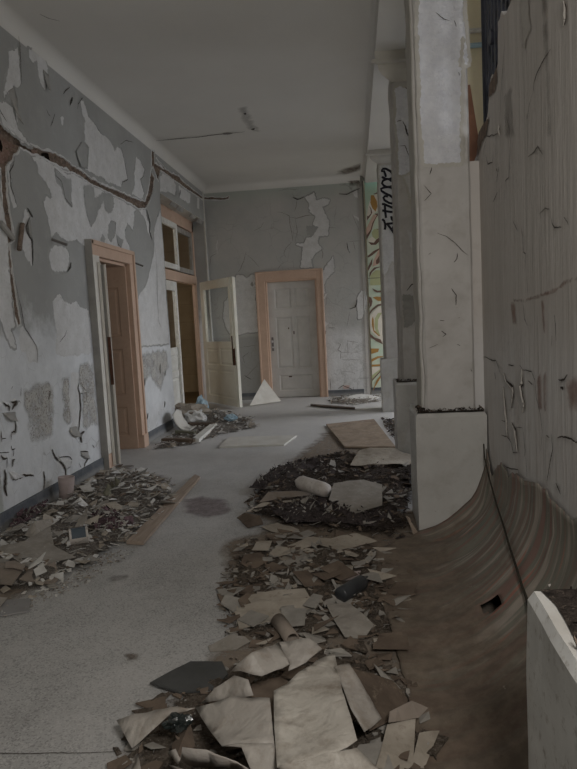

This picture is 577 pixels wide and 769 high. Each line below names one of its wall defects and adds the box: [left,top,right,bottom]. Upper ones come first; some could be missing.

crack [561,0,569,26]
crack [156,132,240,141]
peeling [414,0,472,168]
peeling [0,41,230,388]
peeling [295,191,336,299]
peeling [378,163,394,279]
peeling [349,290,367,320]
peeling [0,294,97,496]
crack [486,357,577,479]